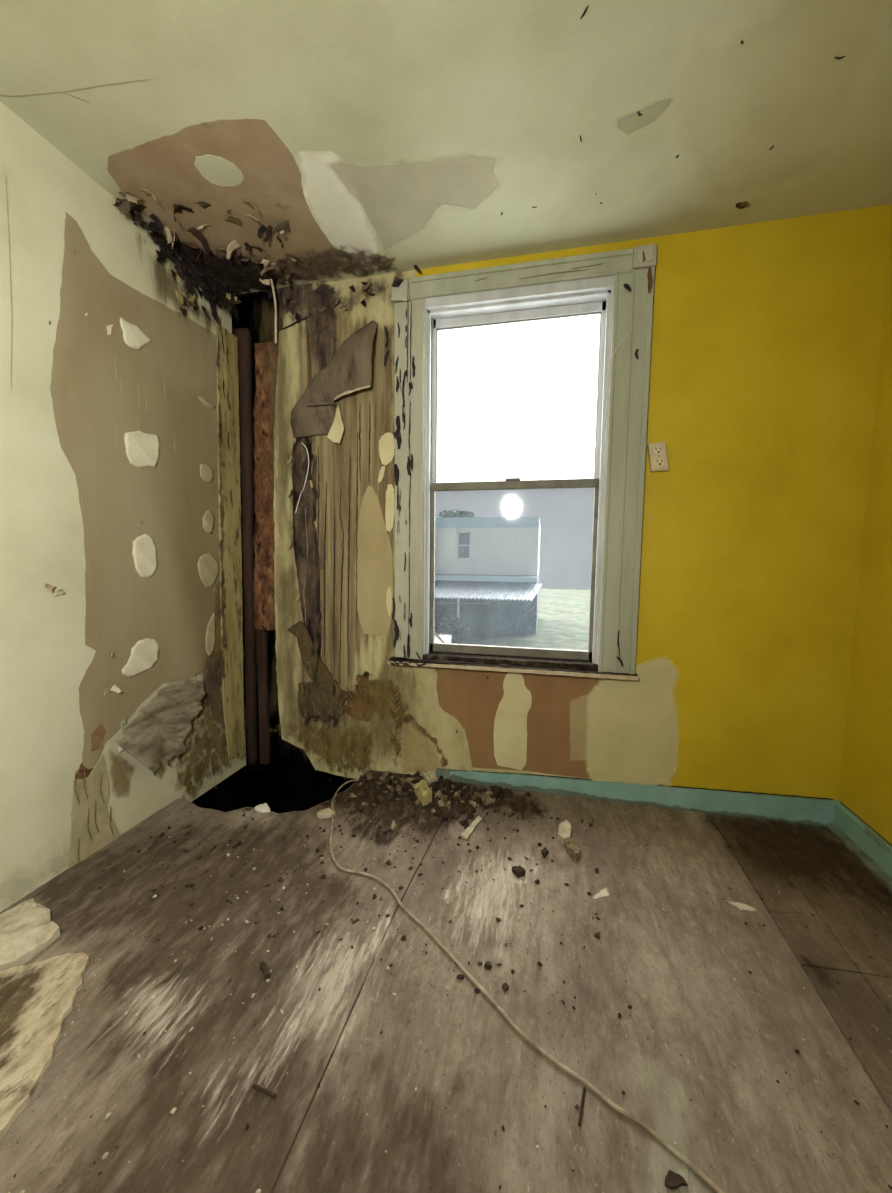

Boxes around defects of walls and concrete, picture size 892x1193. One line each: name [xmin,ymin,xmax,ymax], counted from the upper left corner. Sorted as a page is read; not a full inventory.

peeling [44,583,65,596]
peeling [50,119,358,779]
spalling [192,630,355,814]
leakage [111,158,548,845]
peeling [384,294,543,667]
peeling [643,251,653,293]